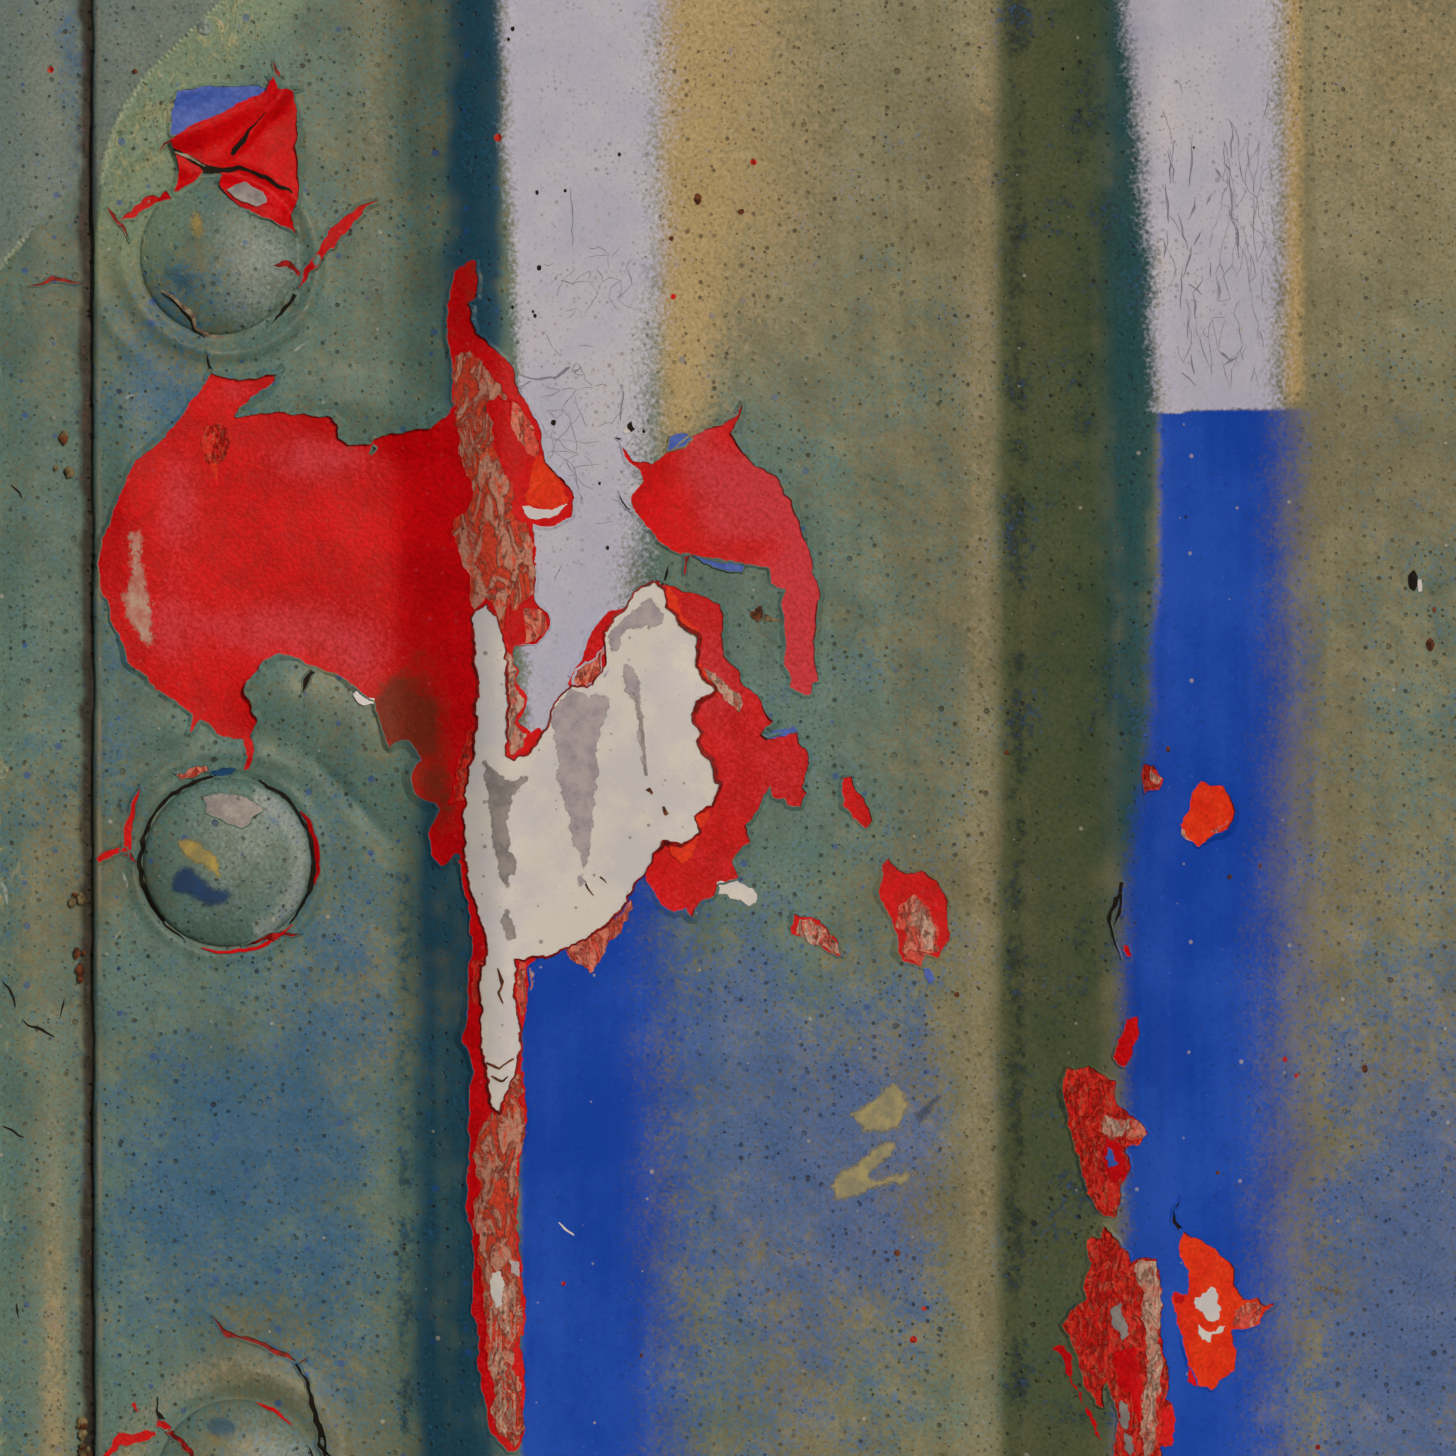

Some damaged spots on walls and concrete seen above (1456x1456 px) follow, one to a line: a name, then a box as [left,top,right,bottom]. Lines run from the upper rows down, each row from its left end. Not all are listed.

peeling [157,59,307,238]
peeling [91,259,825,1455]
peeling [787,908,845,959]
peeling [837,774,875,831]
peeling [872,857,951,984]
peeling [1179,779,1240,849]
peeling [1052,1014,1279,1456]
crack [100,1396,196,1456]
crack [209,1314,334,1456]